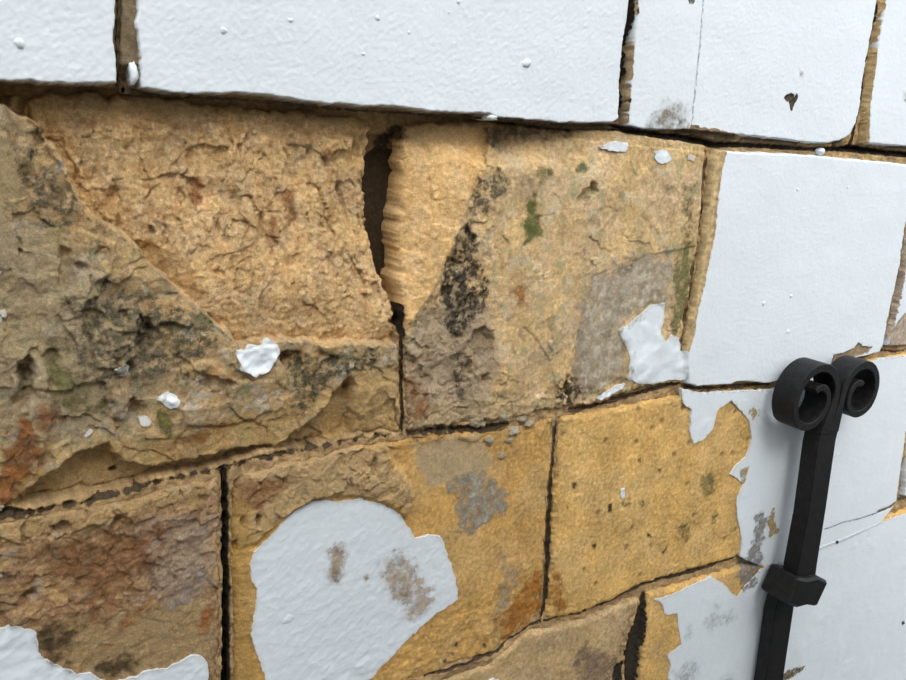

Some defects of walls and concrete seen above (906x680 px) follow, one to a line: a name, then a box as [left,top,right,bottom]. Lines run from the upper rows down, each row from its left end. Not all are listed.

rust [0,404,57,504]
peeling [0,624,105,680]
spalling [0,92,494,377]
crack [0,301,509,680]
peeling [249,498,458,680]
crack [116,0,906,350]
crack [424,382,770,680]
peeling [596,149,805,680]
leakage [767,508,779,537]
peeling [784,232,906,680]
crack [822,497,906,530]
crack [857,348,906,358]